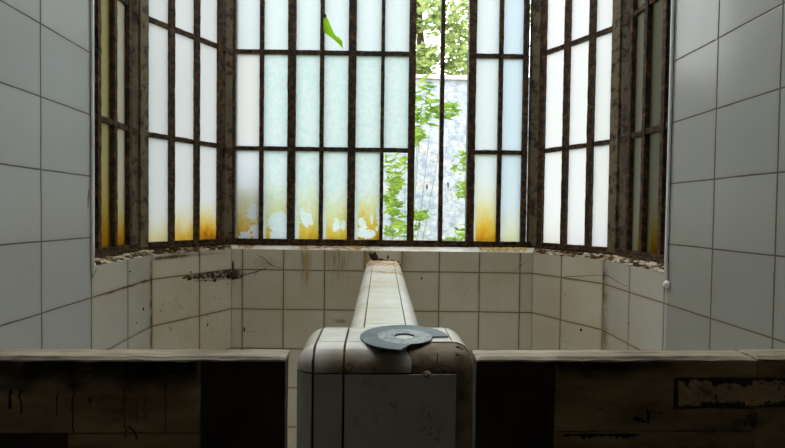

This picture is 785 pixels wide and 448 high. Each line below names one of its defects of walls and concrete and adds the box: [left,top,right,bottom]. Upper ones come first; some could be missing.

spalling [92,245,227,278]
spalling [535,248,664,272]
water stain [0,361,197,434]
peeling [678,379,785,428]